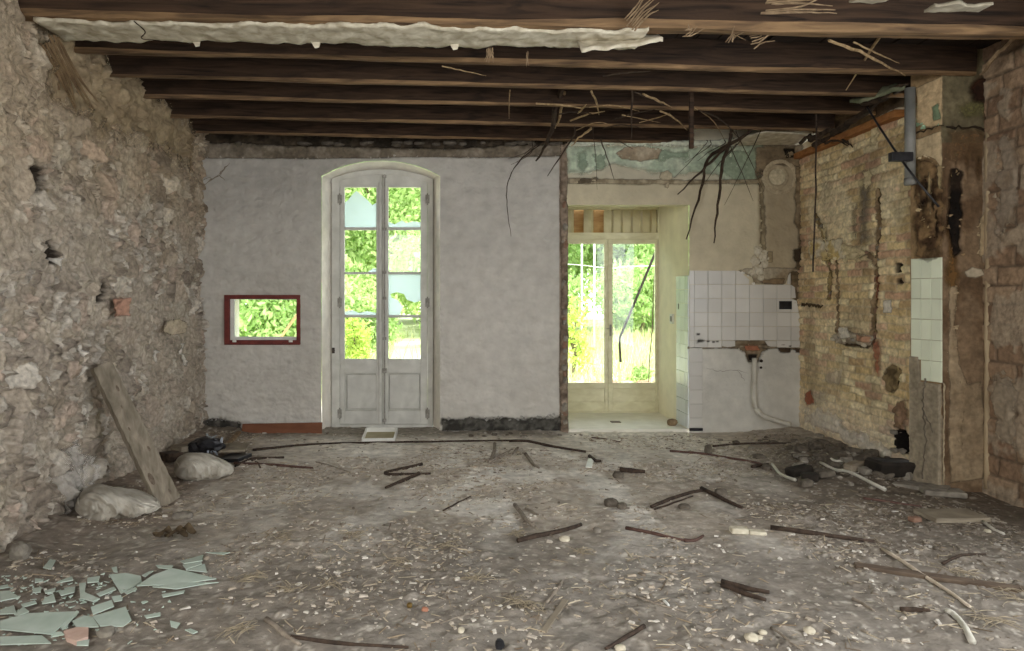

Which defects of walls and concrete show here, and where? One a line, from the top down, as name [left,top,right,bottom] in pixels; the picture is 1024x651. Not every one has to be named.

peeling [204,138,741,162]
peeling [916,77,944,168]
peeling [739,167,879,305]
water stain [912,130,984,291]
spalling [734,340,800,362]
spalling [830,319,878,349]
spalling [441,402,568,431]
spalling [882,364,910,455]